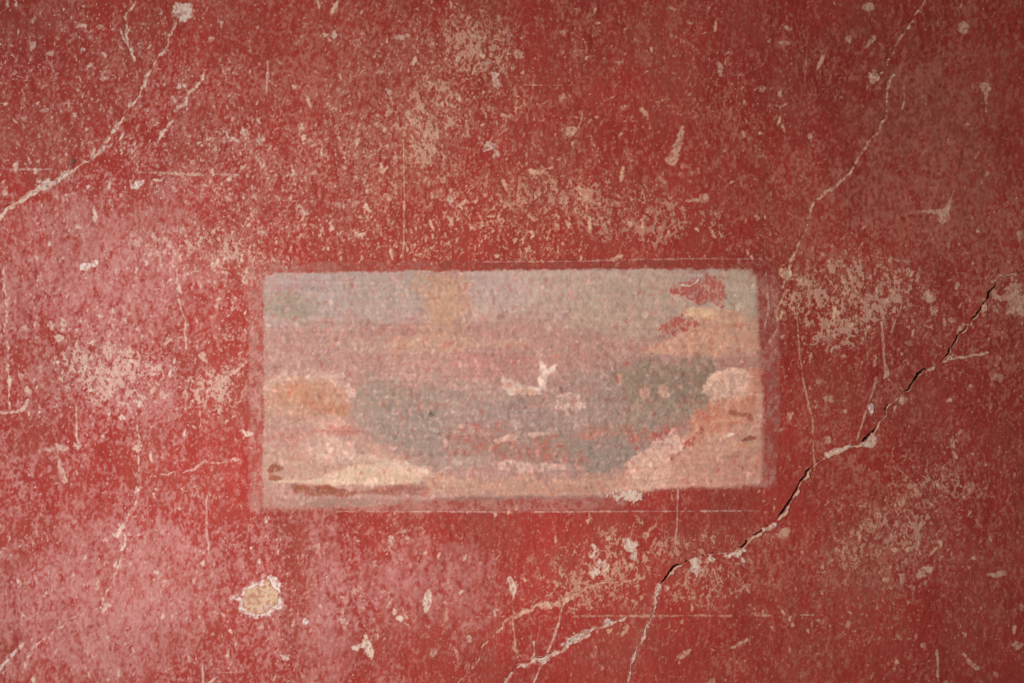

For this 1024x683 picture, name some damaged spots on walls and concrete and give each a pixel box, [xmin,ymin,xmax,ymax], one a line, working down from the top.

crack [0,0,177,222]
crack [156,70,206,148]
crack [456,270,1024,683]
spalling [228,574,287,629]